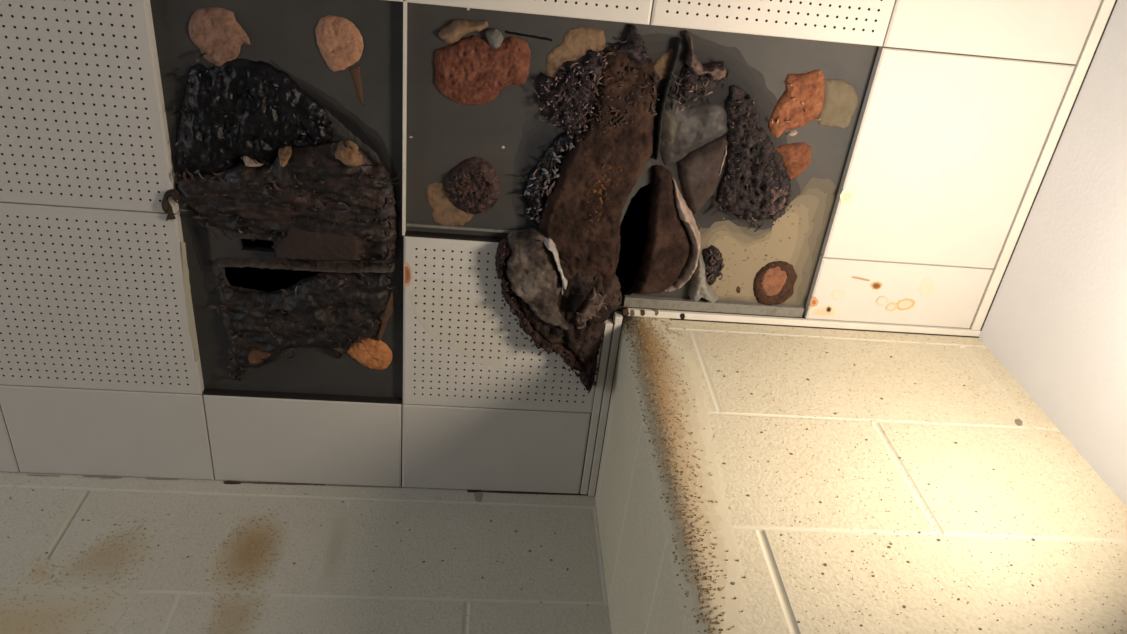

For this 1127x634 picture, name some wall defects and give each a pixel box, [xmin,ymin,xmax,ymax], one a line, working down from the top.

spalling [576,24,660,142]
water stain [876,278,935,312]
water stain [624,317,748,634]
water stain [0,518,161,634]
water stain [202,509,290,634]